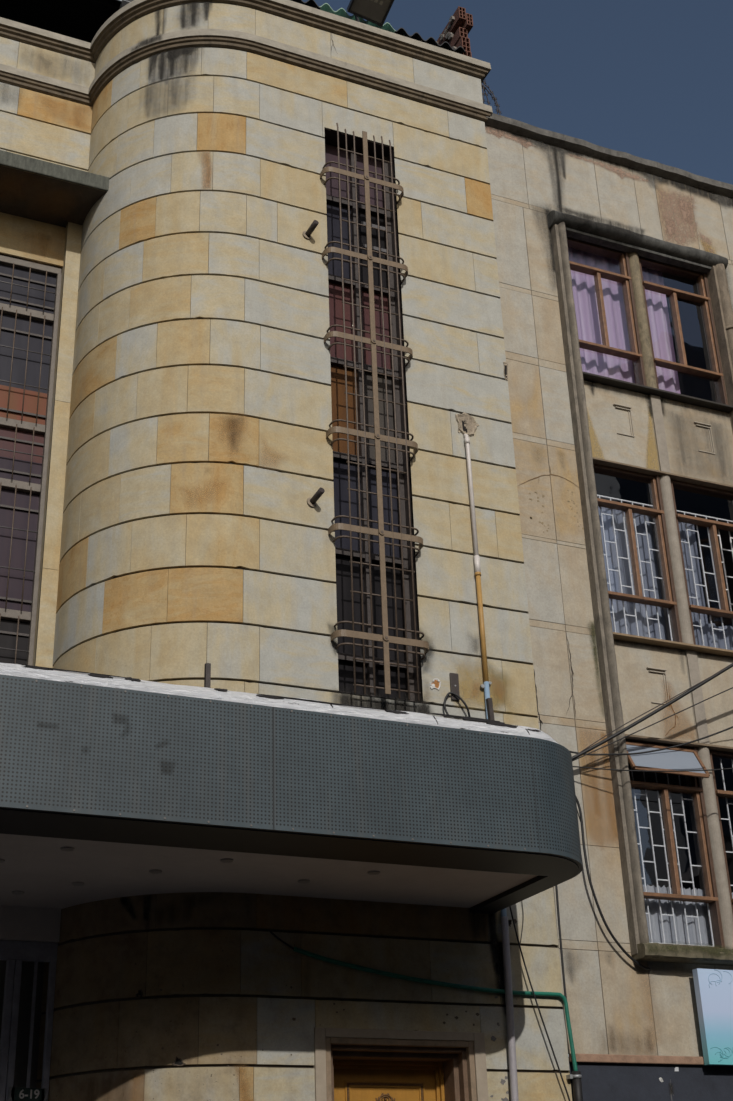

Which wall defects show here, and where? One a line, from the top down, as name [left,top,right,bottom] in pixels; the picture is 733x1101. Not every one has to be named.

water stain [135,10,160,49]
water stain [181,2,210,27]
water stain [149,47,198,82]
crack [534,635,576,730]